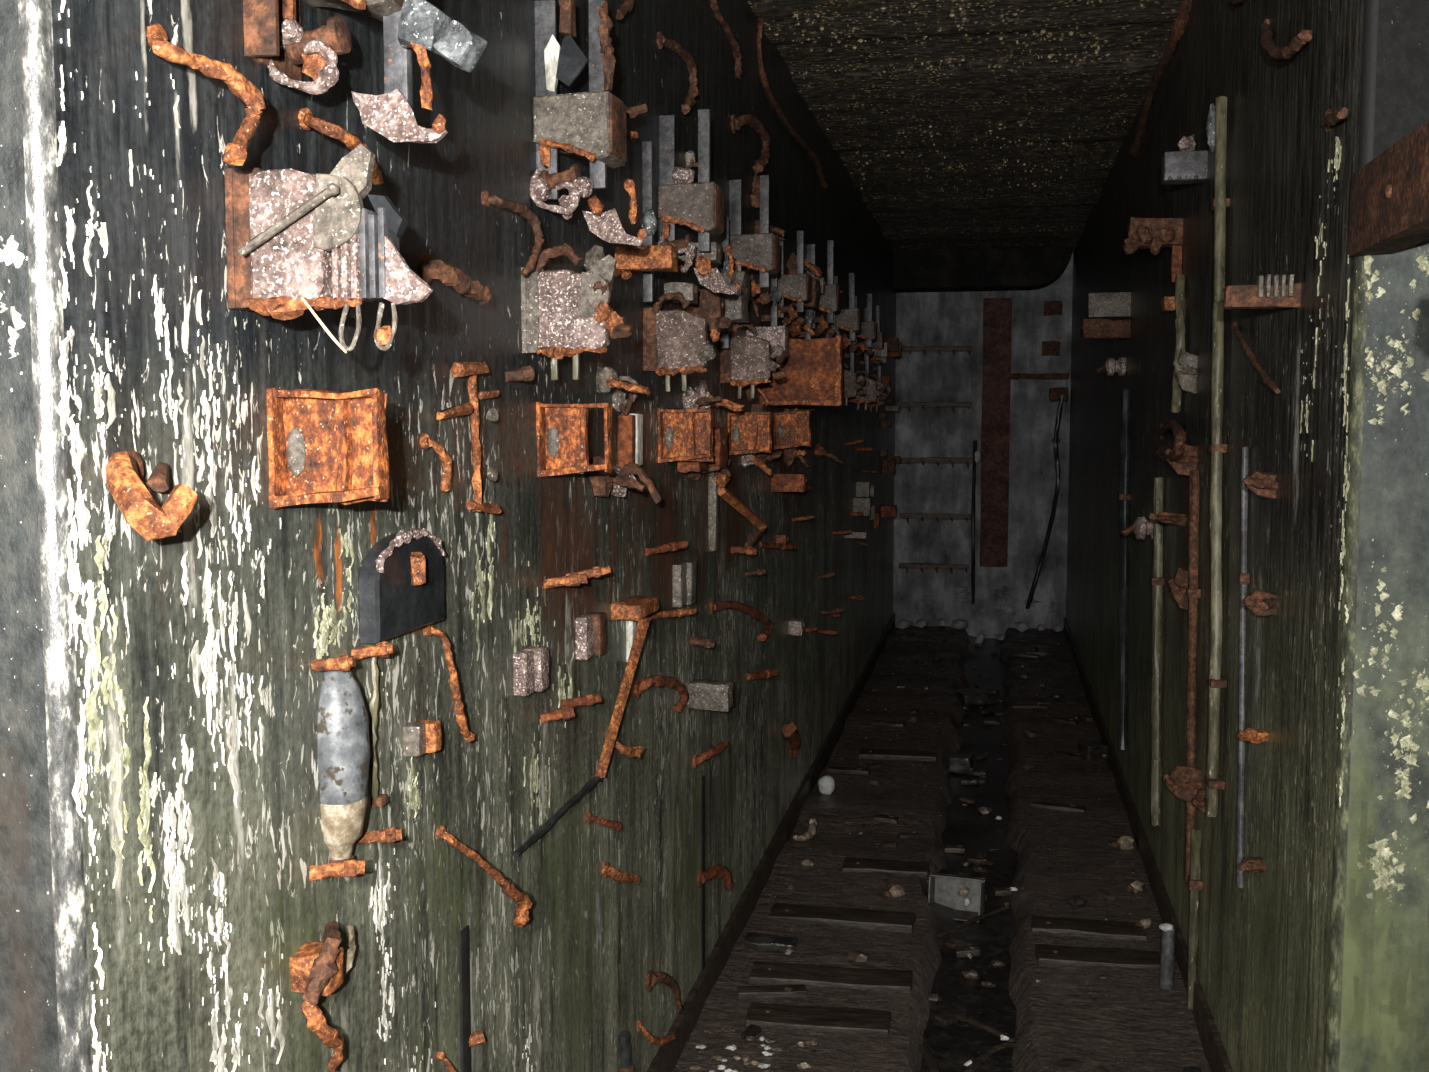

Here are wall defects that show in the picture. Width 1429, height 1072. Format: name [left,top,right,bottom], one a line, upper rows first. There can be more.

peeling [58,0,70,46]
peeling [56,65,84,167]
peeling [129,150,182,225]
damp [182,413,193,489]
damp [183,508,195,598]
peeling [302,528,355,659]
peeling [51,266,291,1072]
damp [109,715,123,890]
damp [228,685,243,870]
peeling [370,756,422,1041]
peeling [411,1046,432,1072]
damp [533,966,541,1072]